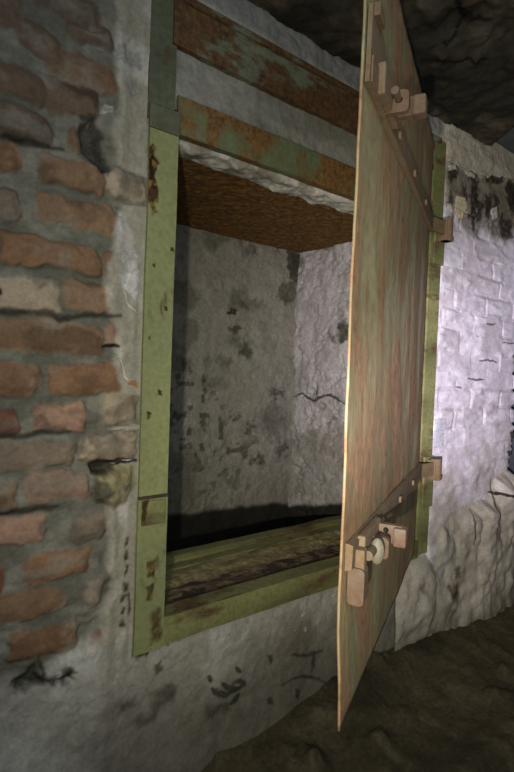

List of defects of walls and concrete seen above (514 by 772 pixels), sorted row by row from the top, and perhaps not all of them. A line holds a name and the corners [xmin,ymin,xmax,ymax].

rust [148,144,158,212]
water stain [447,163,514,240]
crack [294,386,345,404]
crack [488,486,514,541]
rust [147,559,155,600]